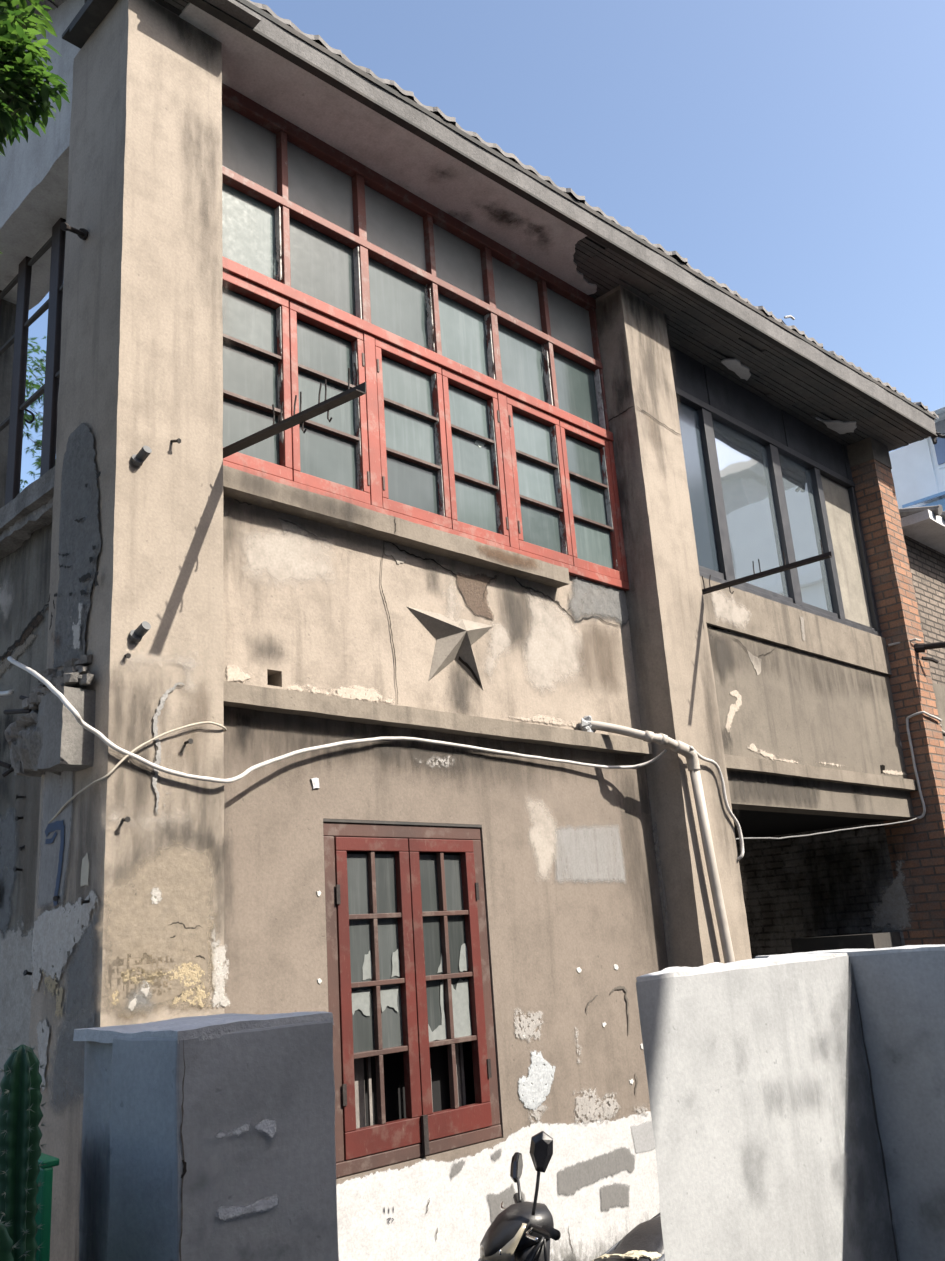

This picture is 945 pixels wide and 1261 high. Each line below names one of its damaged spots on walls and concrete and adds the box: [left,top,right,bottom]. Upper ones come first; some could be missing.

crack [381,516,465,704]
crack [514,577,619,626]
peeling [725,690,742,733]
peeling [0,852,98,1093]
peeling [111,916,230,1011]
peeling [518,1051,556,1123]
peeling [574,1089,619,1124]